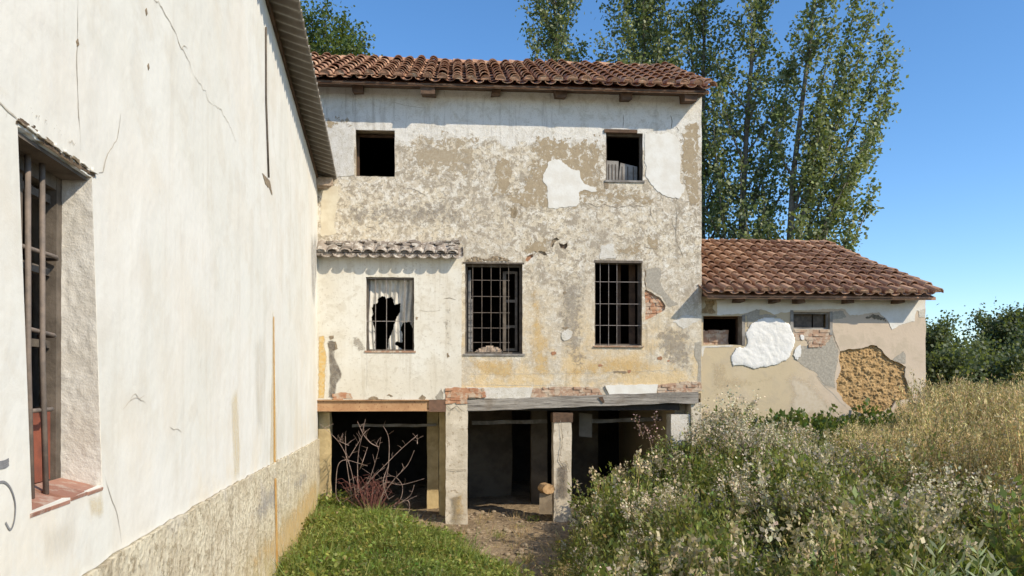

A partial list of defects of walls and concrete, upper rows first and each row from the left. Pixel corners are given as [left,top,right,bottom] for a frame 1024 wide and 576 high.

peeling [406,130,655,218]
peeling [679,123,701,207]
peeling [524,238,567,261]
peeling [617,235,659,256]
peeling [645,268,678,320]
flaking render [419,387,486,404]
flaking render [531,387,603,397]
flaking render [657,342,702,393]
peeling [716,299,926,388]